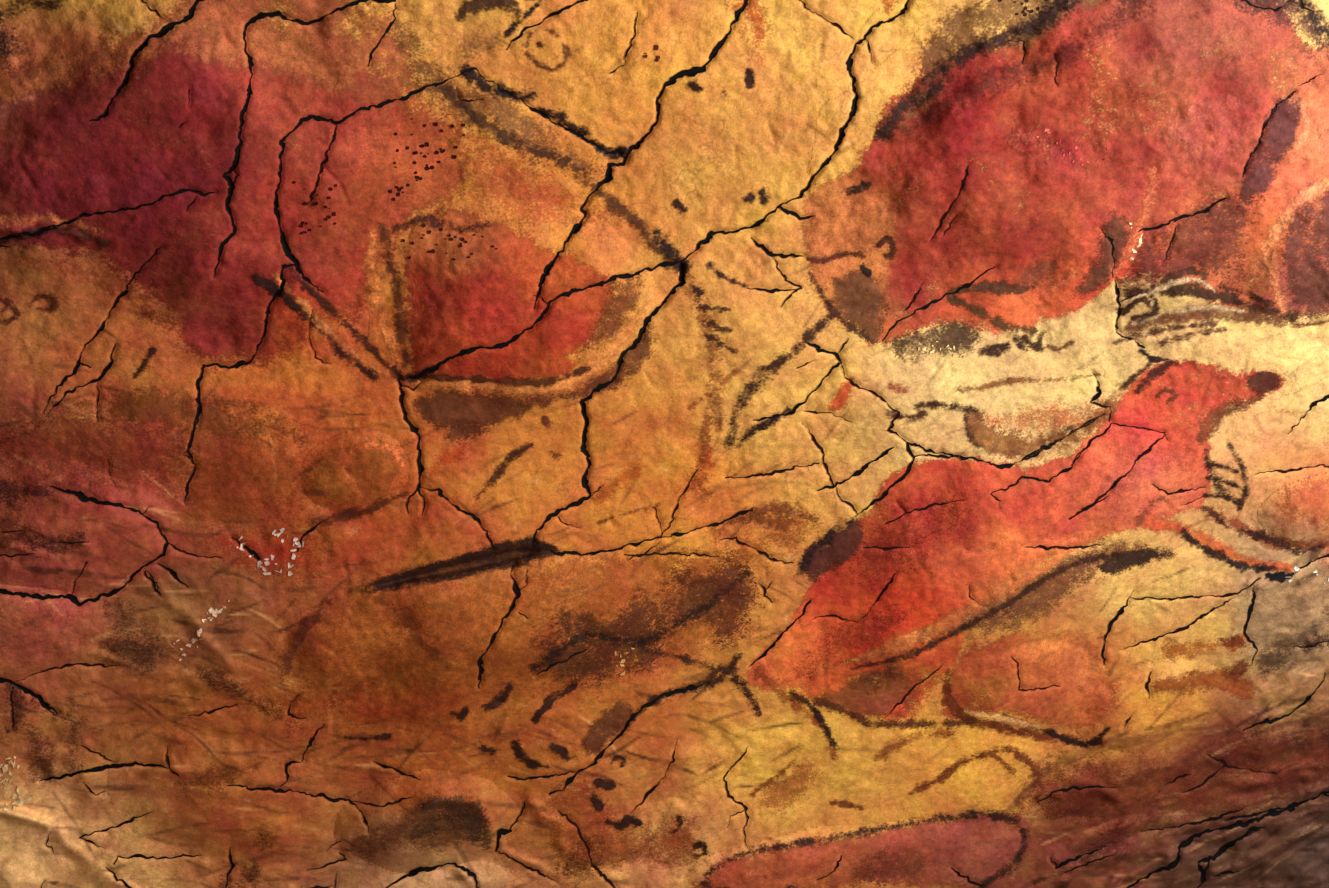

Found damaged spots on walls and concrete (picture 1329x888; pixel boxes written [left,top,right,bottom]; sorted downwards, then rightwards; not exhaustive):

crack [1101,74,1322,349]
crack [0,0,1204,691]
crack [1258,464,1329,474]
crack [1288,395,1329,434]
crack [0,663,118,731]
crack [1096,577,1261,730]
crack [40,745,179,795]
crack [41,811,235,888]
crack [228,694,420,888]
crack [386,683,705,888]
crack [724,747,749,847]
crack [1050,754,1329,888]